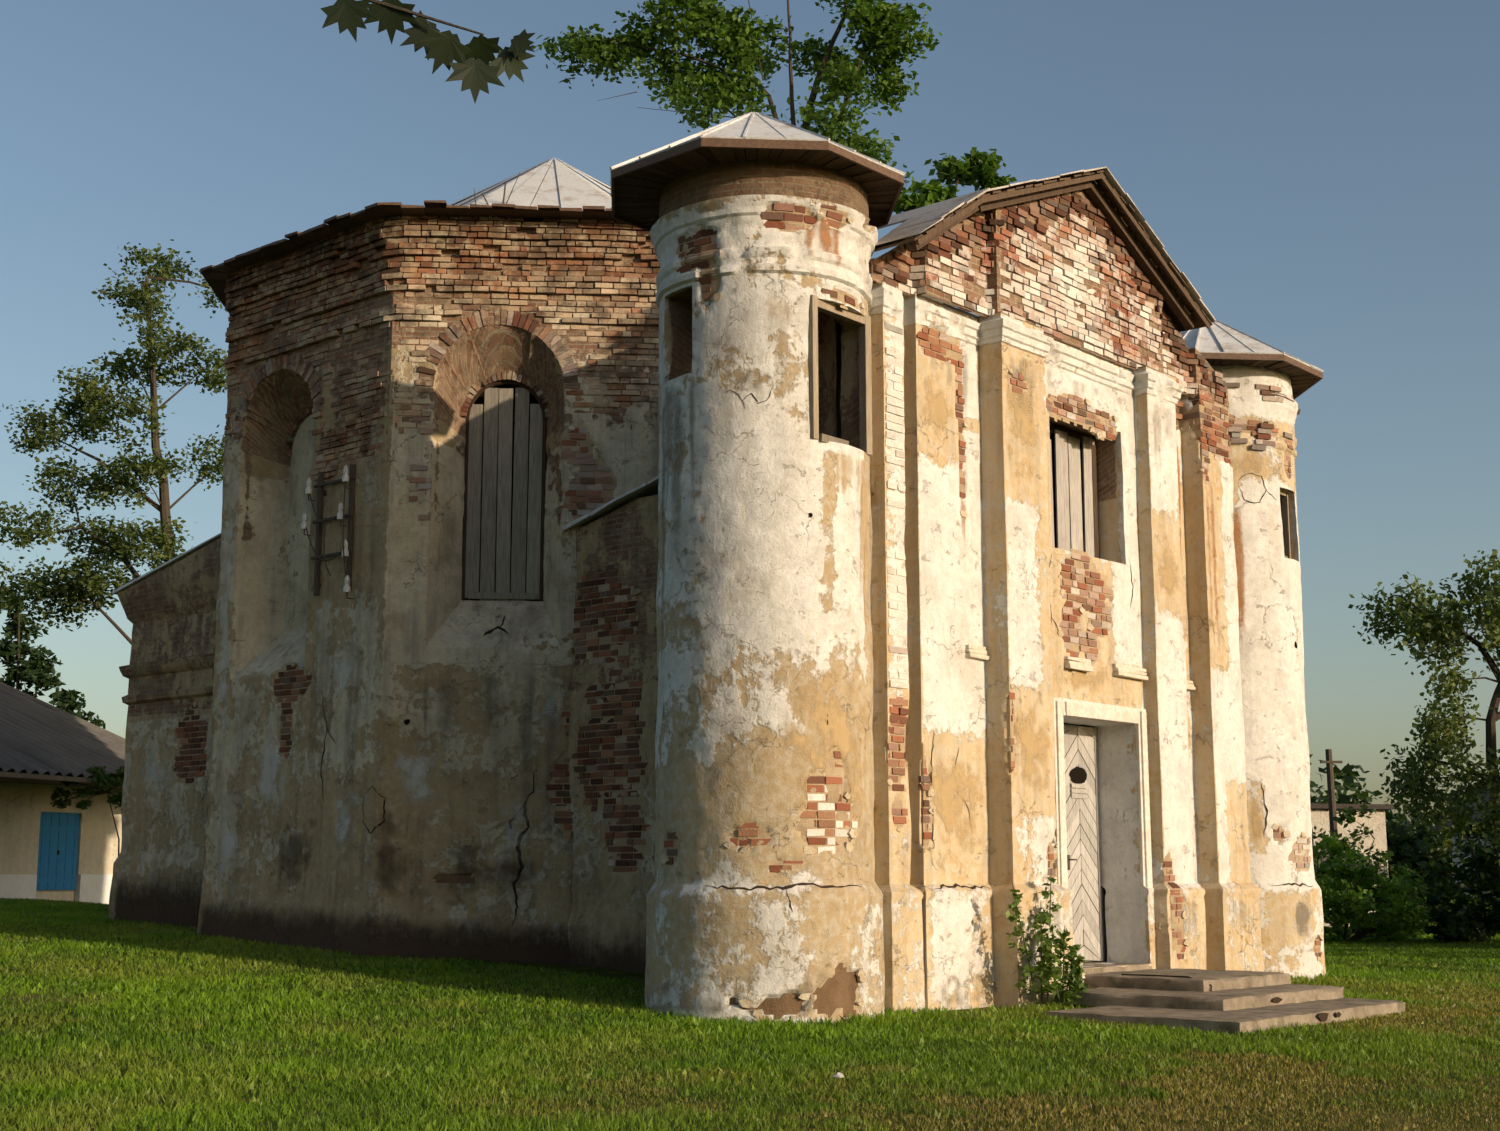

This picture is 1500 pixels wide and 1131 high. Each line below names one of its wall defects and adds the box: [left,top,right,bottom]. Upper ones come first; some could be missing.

flaking render [761,202,854,232]
flaking render [1057,549,1114,687]
flaking render [173,700,208,786]
flaking render [269,662,316,758]
flaking render [546,562,681,872]
flaking render [770,671,865,873]
peeling [885,697,976,850]
water stain [114,882,646,974]
crack [509,770,537,927]
flaking render [724,822,771,853]
crack [712,882,862,911]
flaking render [729,963,866,1020]